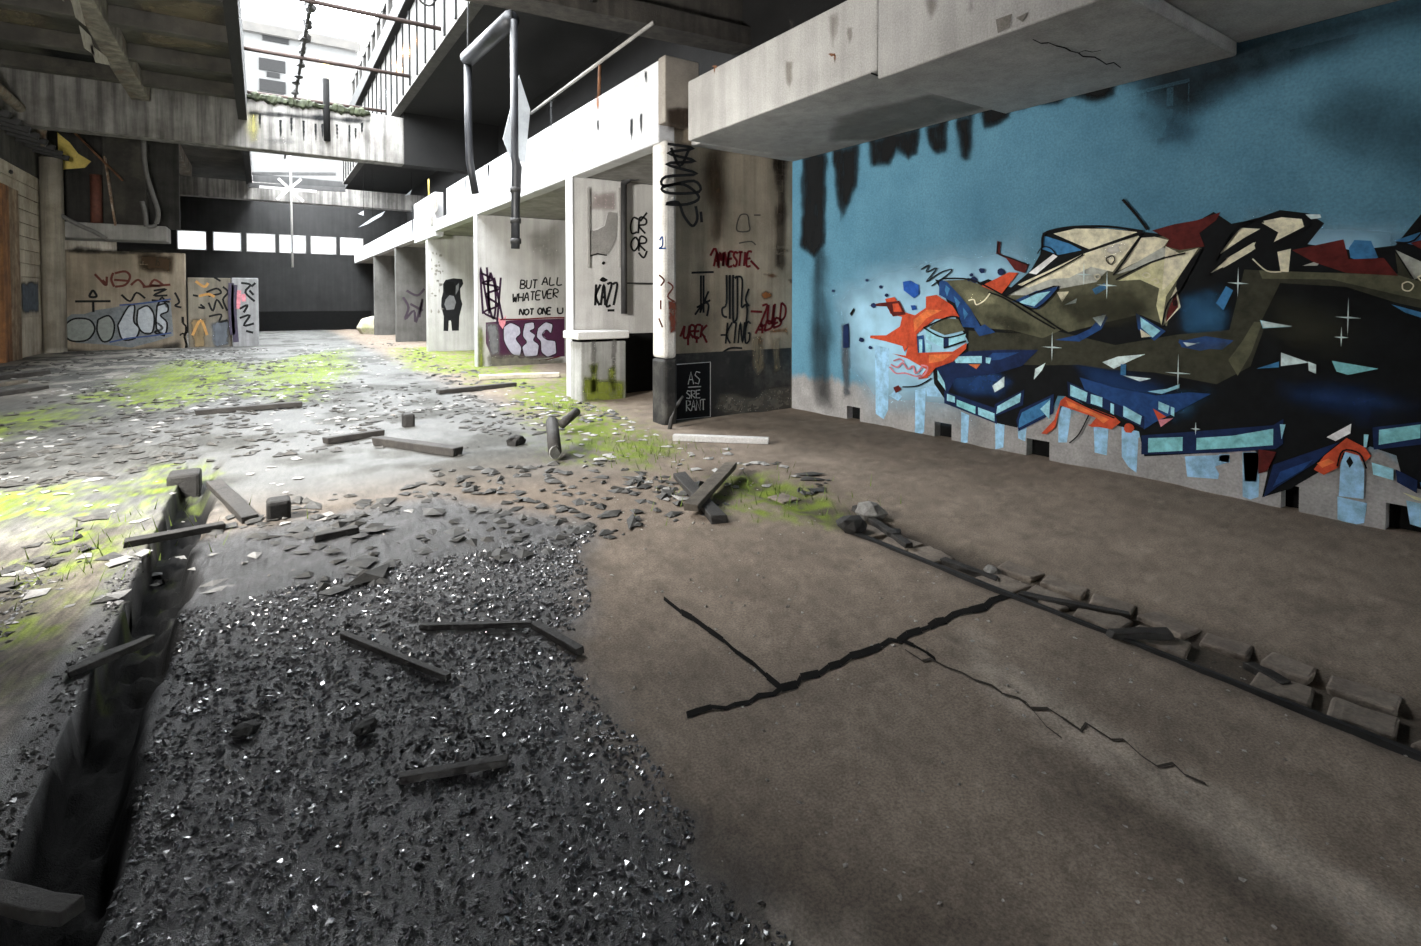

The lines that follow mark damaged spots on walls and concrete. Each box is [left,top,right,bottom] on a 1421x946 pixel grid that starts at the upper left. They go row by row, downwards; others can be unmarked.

crack [664,593,1206,785]